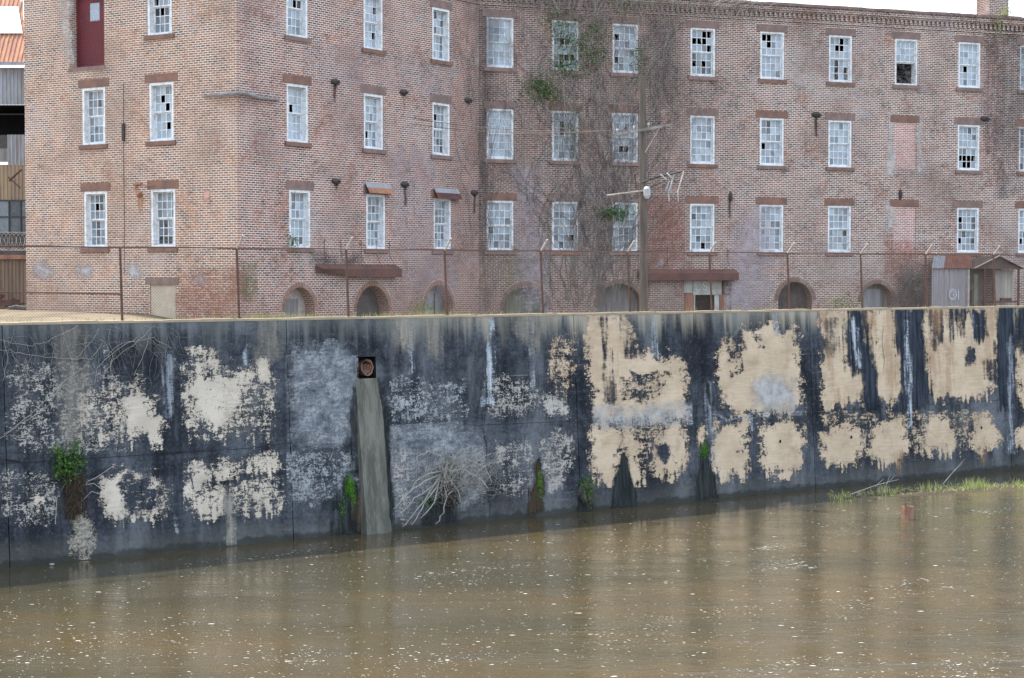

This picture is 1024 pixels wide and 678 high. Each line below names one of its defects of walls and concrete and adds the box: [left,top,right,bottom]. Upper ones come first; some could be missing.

peeling [0,343,360,560]
water stain [394,318,443,372]
water stain [481,317,495,405]
peeling [383,308,1024,524]
water stain [723,331,765,377]
water stain [825,310,881,410]
water stain [892,308,1024,427]